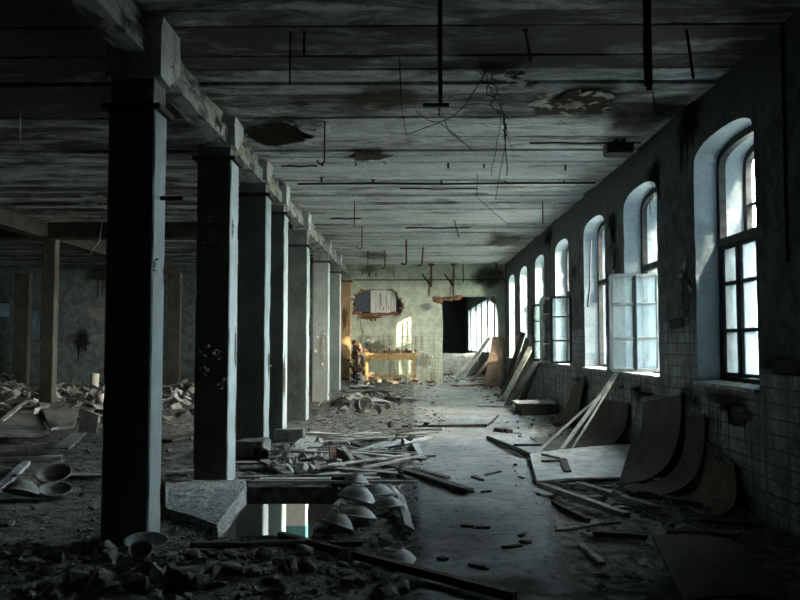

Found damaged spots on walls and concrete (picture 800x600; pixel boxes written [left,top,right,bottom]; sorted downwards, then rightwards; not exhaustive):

peeling [527,90,615,119]
peeling [282,120,333,145]
spalling [352,294,405,317]